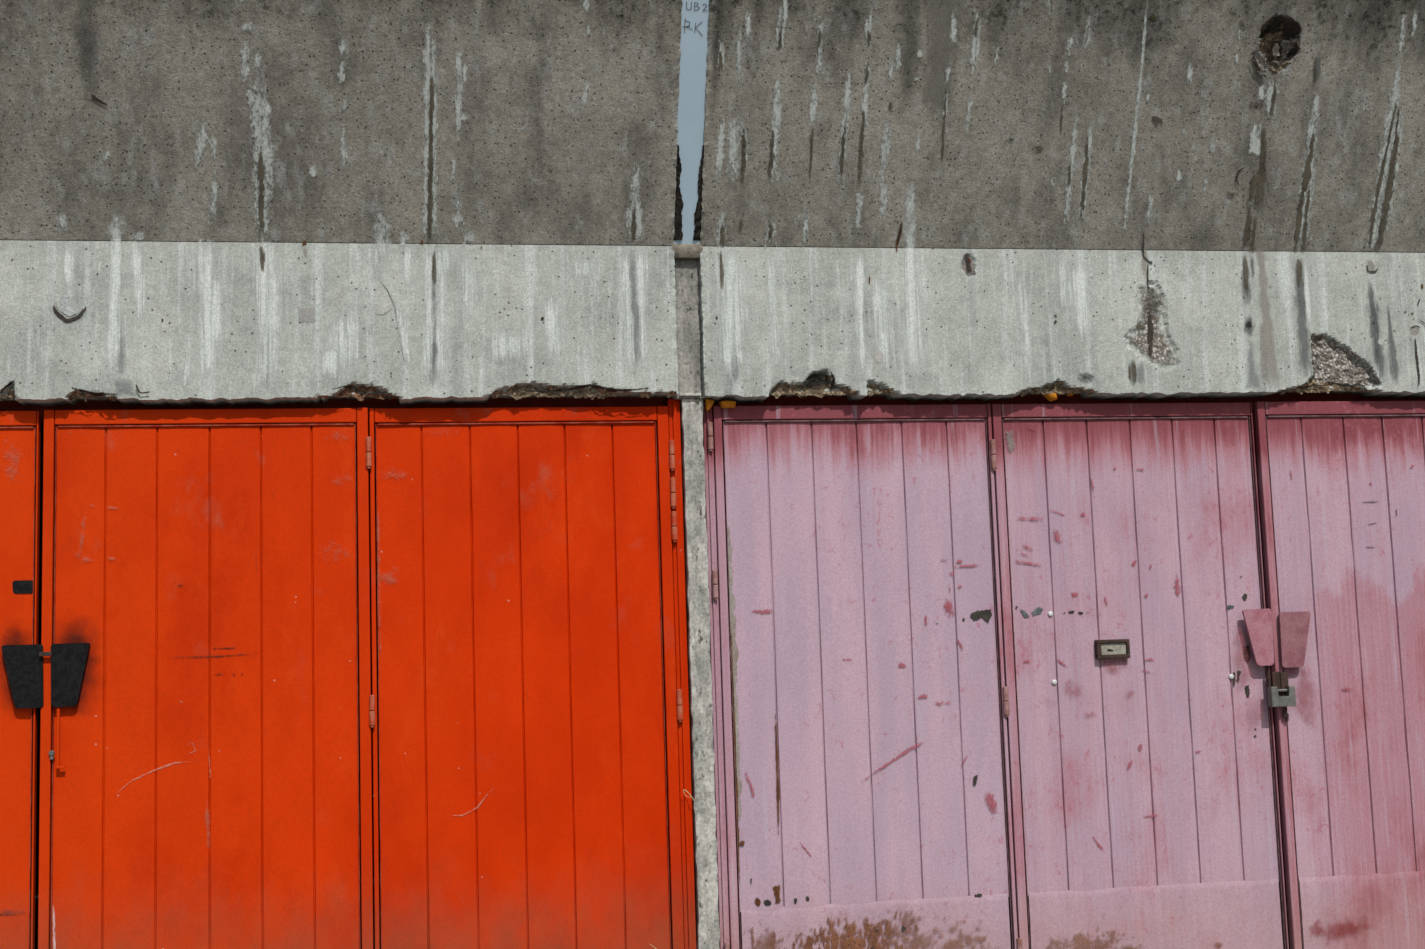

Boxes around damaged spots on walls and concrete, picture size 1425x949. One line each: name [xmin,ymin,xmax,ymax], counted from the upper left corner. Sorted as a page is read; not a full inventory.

leakage [241,22,279,381]
leakage [371,25,475,381]
spalling [491,384,676,400]
spalling [771,371,898,398]
leakage [851,185,923,372]
spalling [1127,288,1176,365]
leakage [1236,80,1279,386]
leakage [1294,56,1321,366]
spalling [1281,334,1380,395]
leakage [1366,14,1417,378]
corrosion [744,909,986,949]
corrosion [1047,931,1137,949]